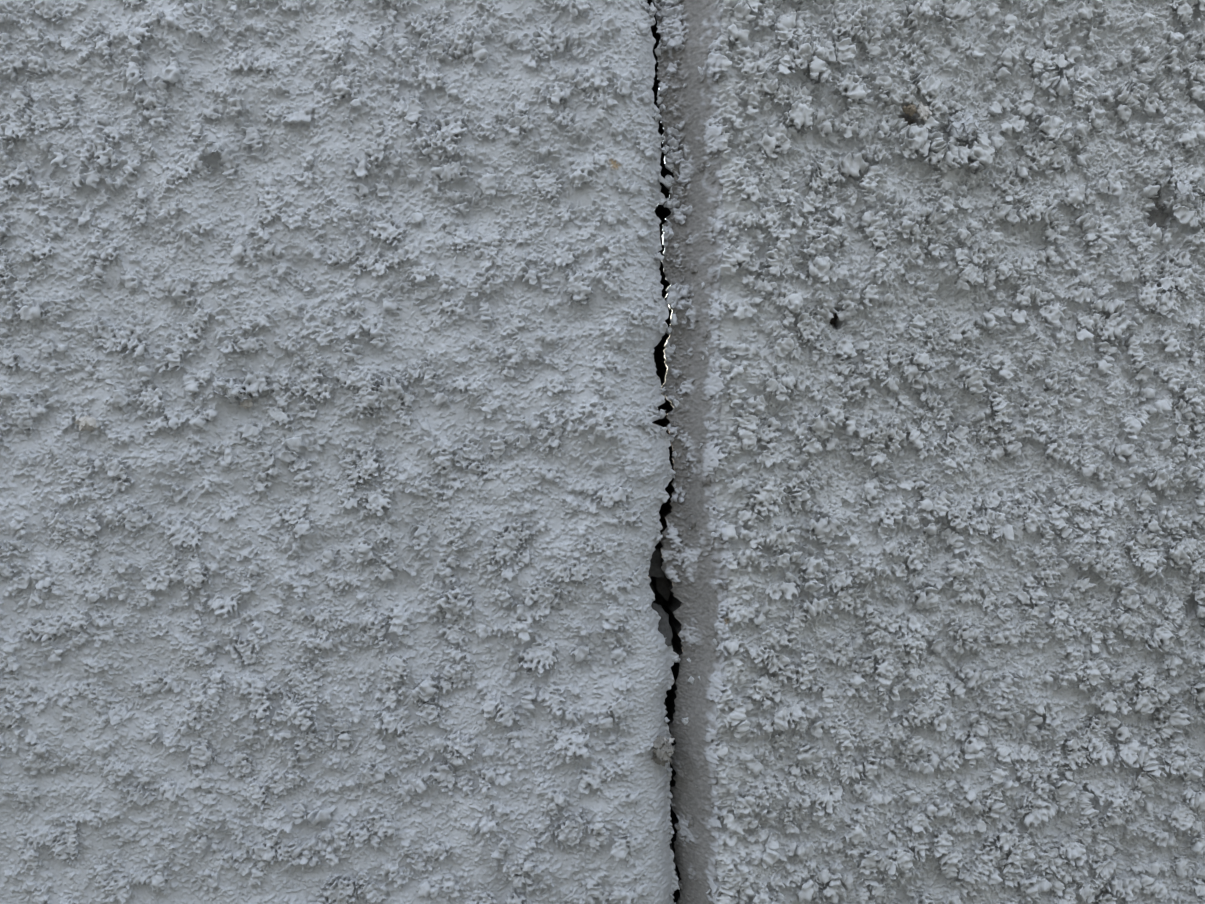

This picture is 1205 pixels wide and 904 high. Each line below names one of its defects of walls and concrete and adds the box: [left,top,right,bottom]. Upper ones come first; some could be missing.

crack [647,0,683,904]